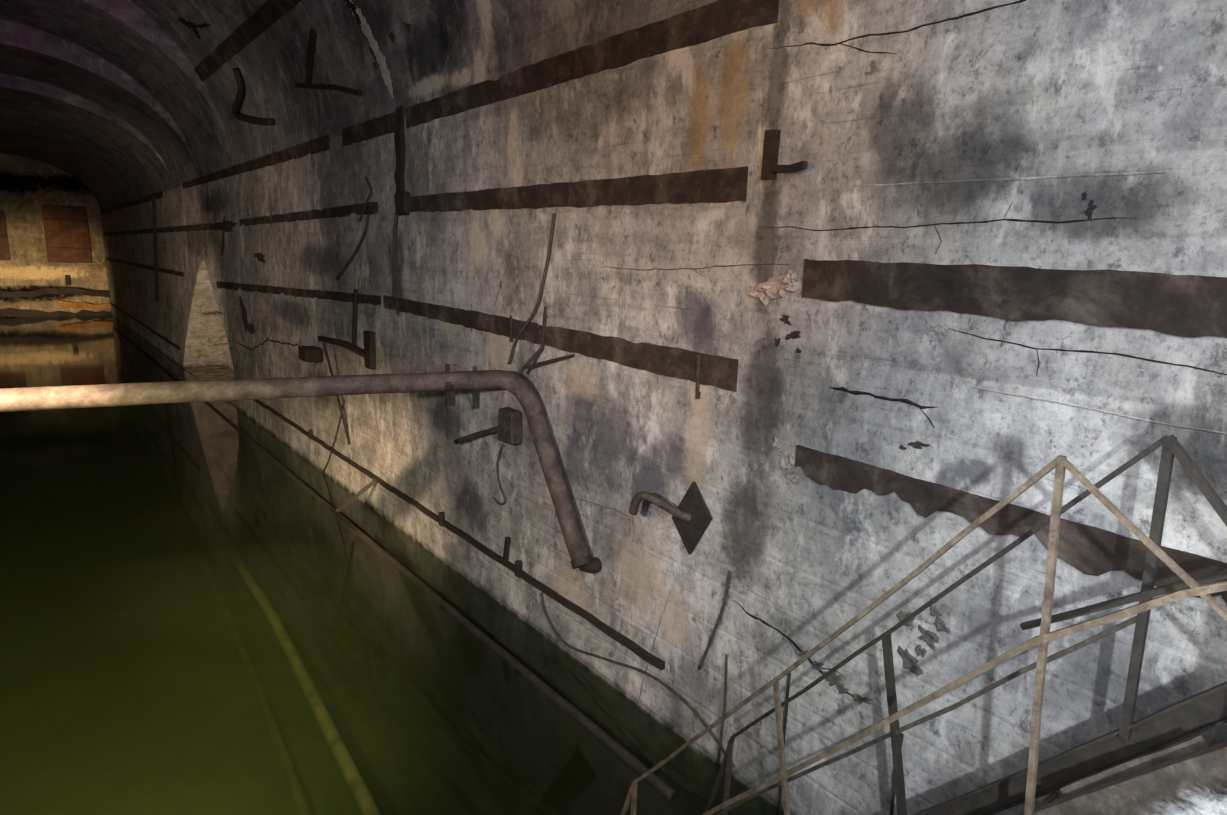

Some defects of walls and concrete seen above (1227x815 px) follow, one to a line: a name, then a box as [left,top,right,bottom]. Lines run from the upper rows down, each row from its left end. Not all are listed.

crack [767,0,1026,54]
crack [948,328,1227,377]